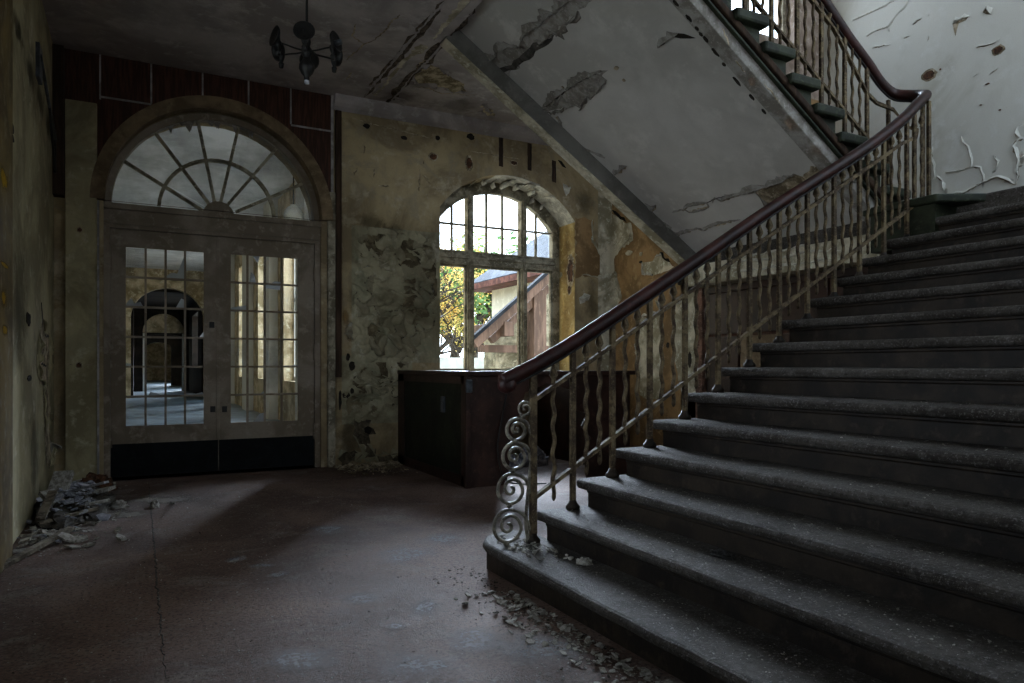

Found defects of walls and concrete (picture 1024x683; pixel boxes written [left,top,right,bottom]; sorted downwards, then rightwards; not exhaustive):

peeling [484,0,592,76]
peeling [542,66,626,115]
peeling [657,0,766,114]
peeling [566,210,674,309]